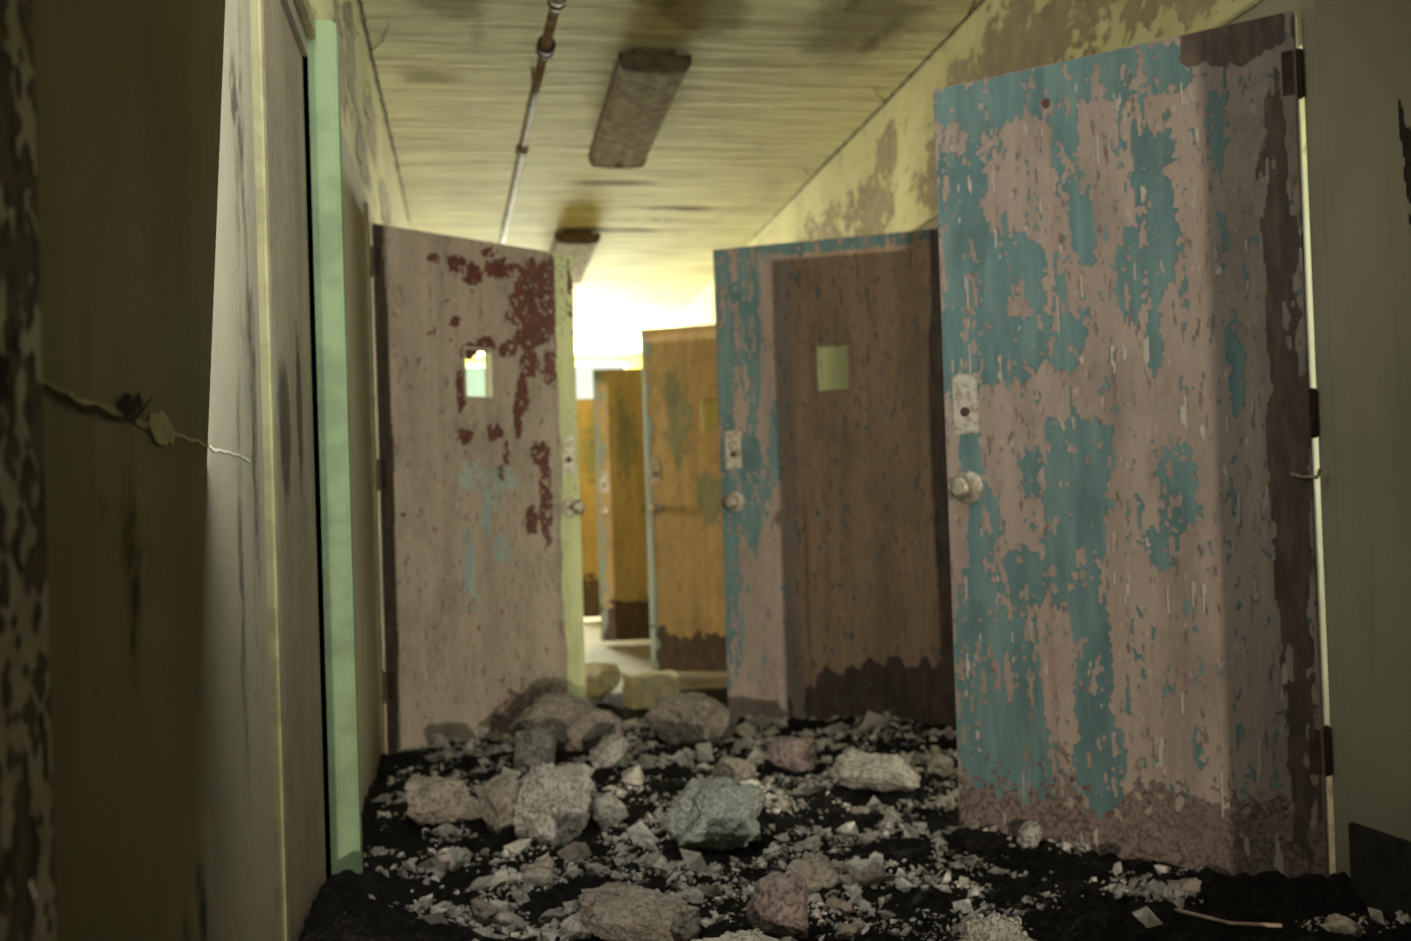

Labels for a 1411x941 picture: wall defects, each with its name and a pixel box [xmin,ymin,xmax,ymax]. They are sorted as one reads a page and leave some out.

crack [42,379,251,462]
peeling [579,387,640,492]
peeling [662,363,694,473]
peeling [696,0,1328,879]
peeling [455,458,531,613]